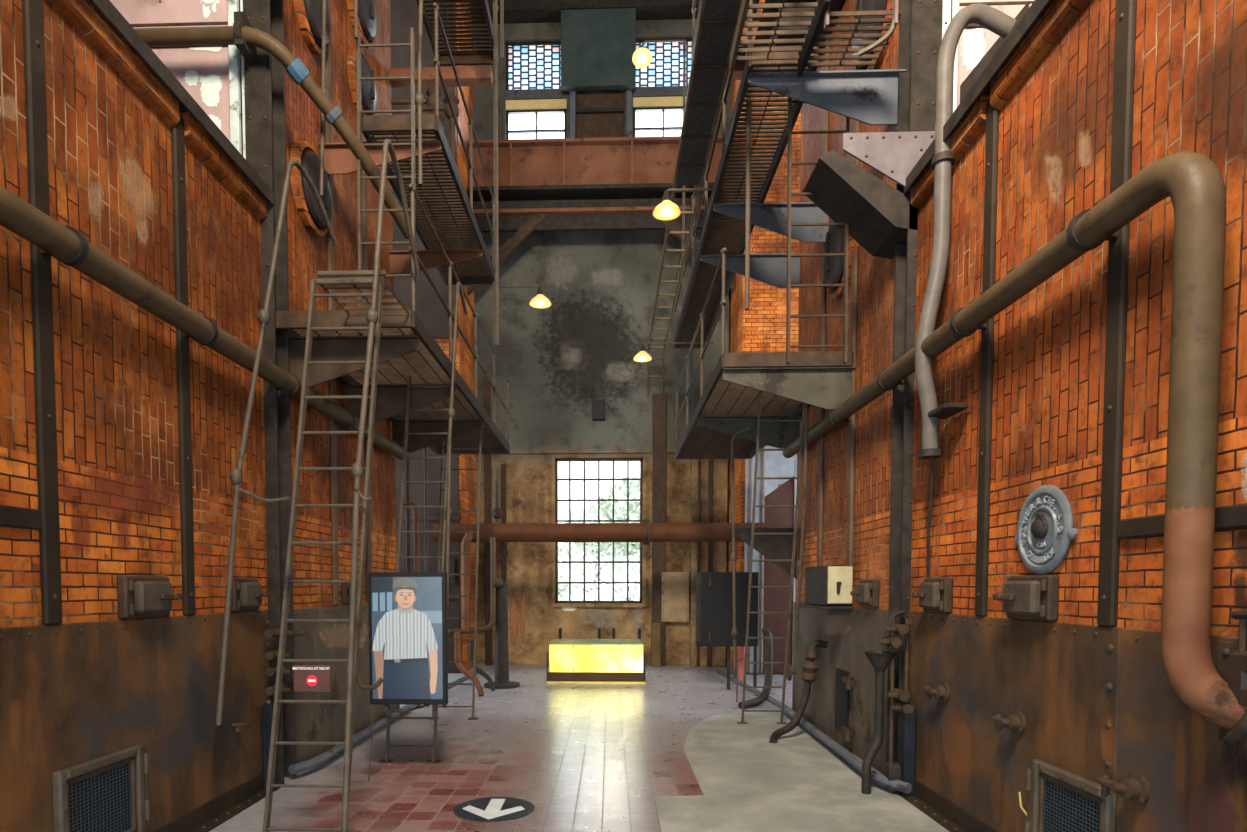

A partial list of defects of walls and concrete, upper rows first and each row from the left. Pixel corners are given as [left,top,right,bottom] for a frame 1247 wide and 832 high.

peeling [200,0,220,19]
peeling [184,70,222,130]